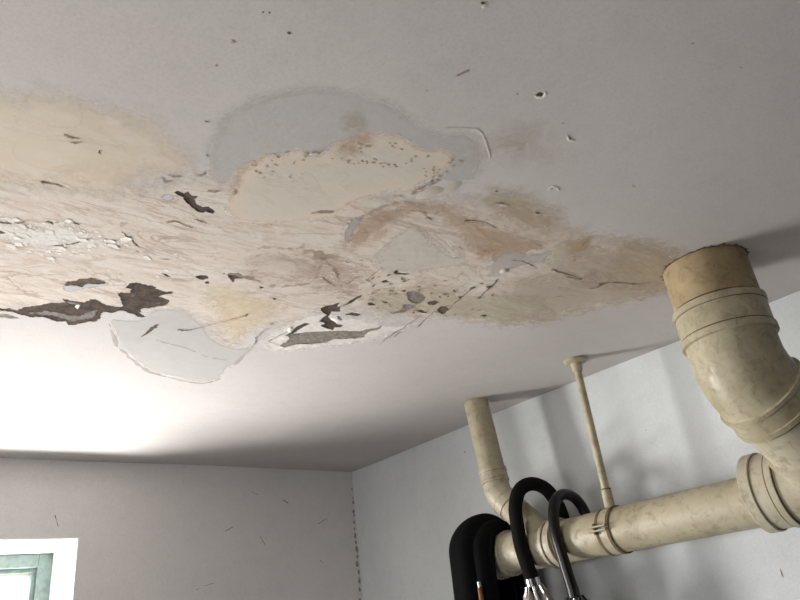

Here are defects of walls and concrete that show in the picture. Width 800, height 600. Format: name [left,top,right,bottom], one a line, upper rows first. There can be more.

peeling [227,118,452,223]
peeling [0,215,132,263]
spalling [162,191,215,214]
leakage [0,90,678,347]
crack [514,243,750,289]
spalling [392,286,450,314]
peeling [0,269,410,384]